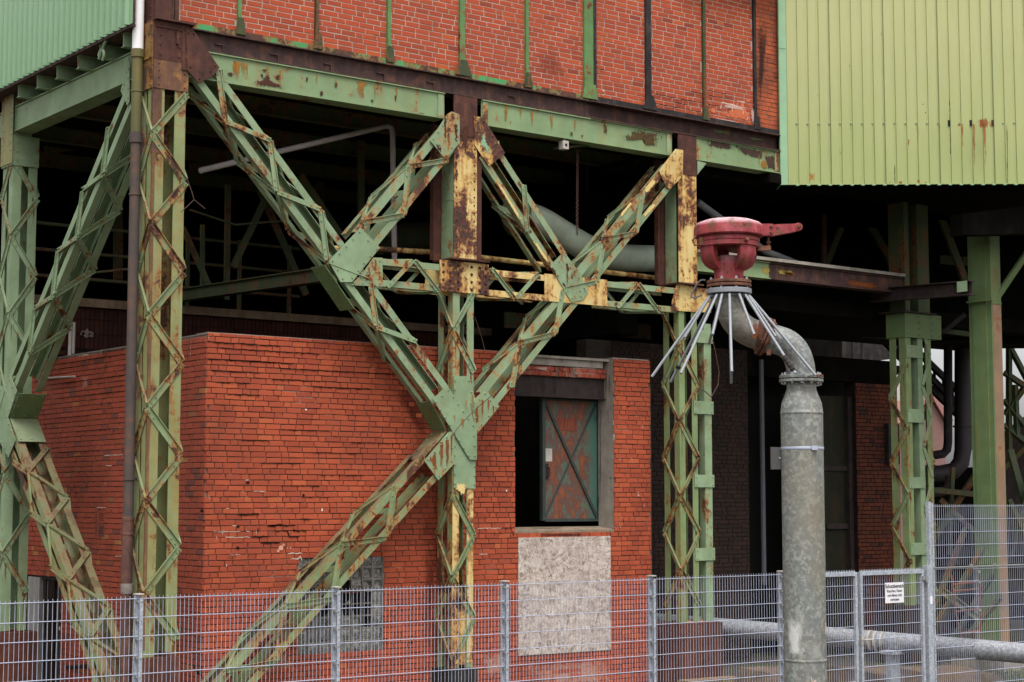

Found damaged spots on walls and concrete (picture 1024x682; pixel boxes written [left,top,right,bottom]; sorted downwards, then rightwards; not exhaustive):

corrosion [436,113,469,152]
corrosion [957,119,991,161]
crack [235,429,398,555]